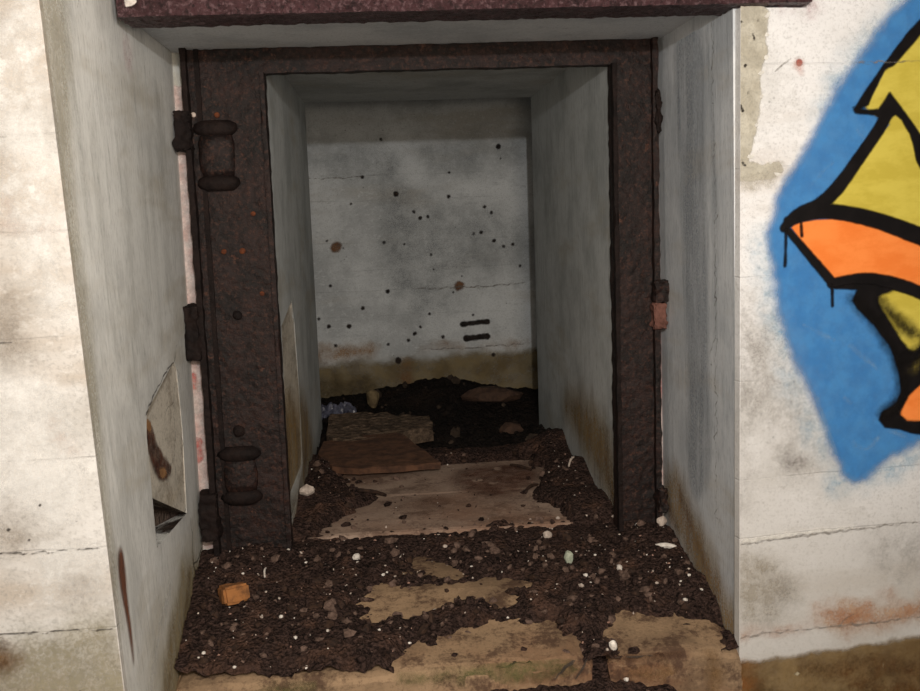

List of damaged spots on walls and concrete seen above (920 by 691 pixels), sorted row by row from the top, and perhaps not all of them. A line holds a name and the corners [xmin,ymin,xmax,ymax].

peeling [740,6,783,189]
rust [147,419,171,480]
rust [118,549,134,659]
damp [0,626,123,691]
damp [741,637,920,691]